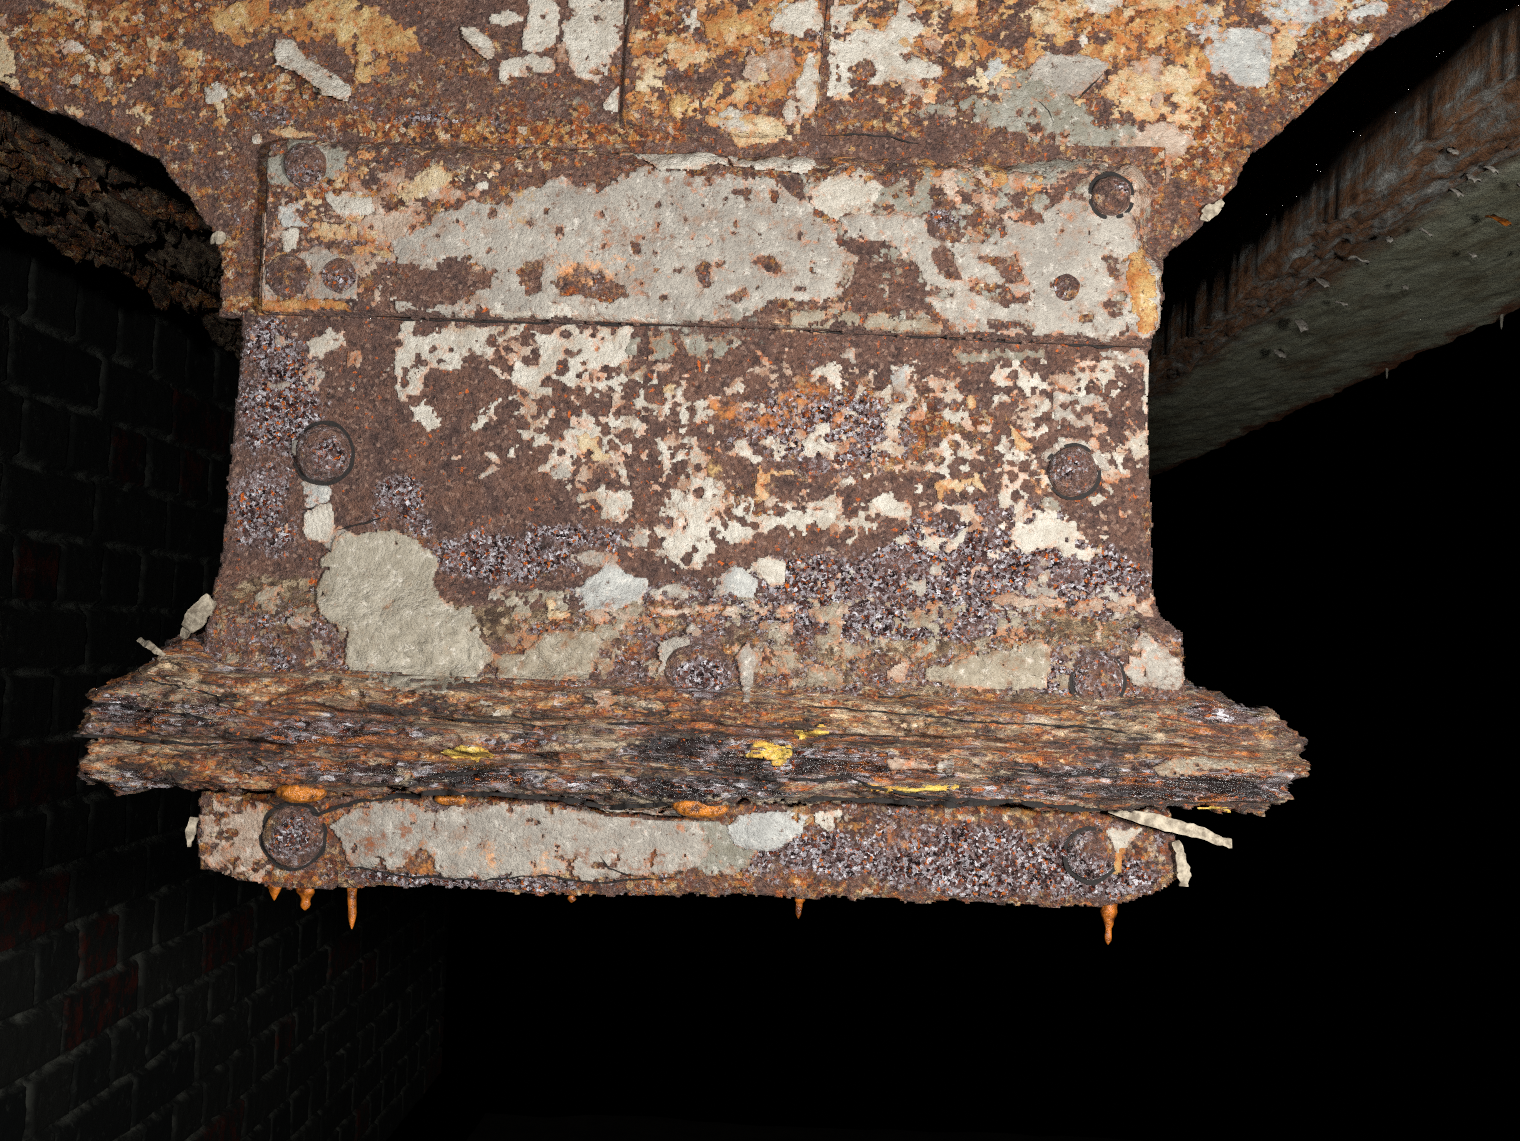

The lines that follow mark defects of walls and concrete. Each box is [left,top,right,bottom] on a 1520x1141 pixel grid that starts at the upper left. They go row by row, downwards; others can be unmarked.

peeling [1450,164,1499,198]
rust [1200,199,1225,222]
peeling [0,0,1389,713]
rust [710,385,827,429]
rust [136,637,166,656]
peeling [1152,751,1311,777]
rust [185,817,199,847]
peeling [330,801,842,883]
rust [1107,810,1232,887]
rust [268,885,315,910]
rust [347,887,357,929]
rust [1100,903,1118,945]